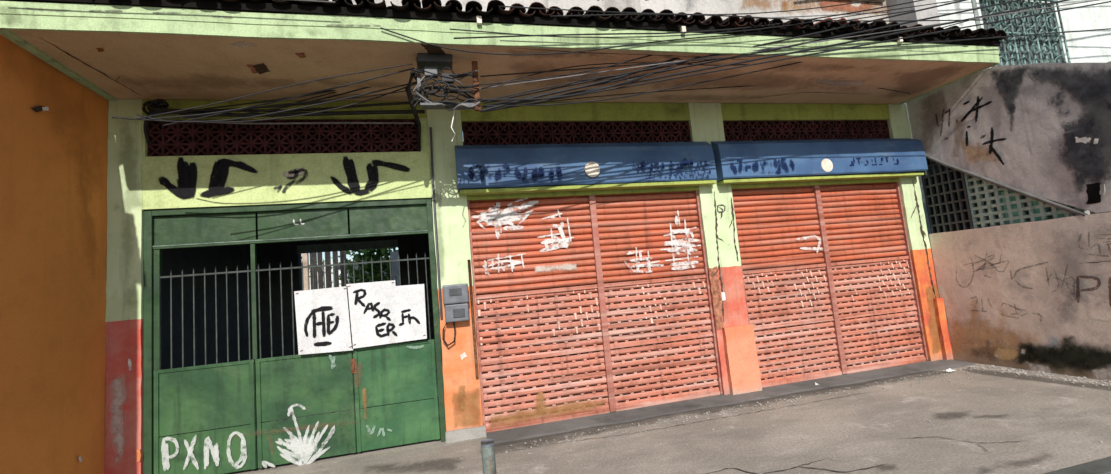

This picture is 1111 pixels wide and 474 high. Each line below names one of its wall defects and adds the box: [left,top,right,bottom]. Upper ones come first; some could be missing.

crack [39,37,141,96]
damp [992,67,1111,191]
damp [952,308,1111,371]
peeling [112,359,132,455]